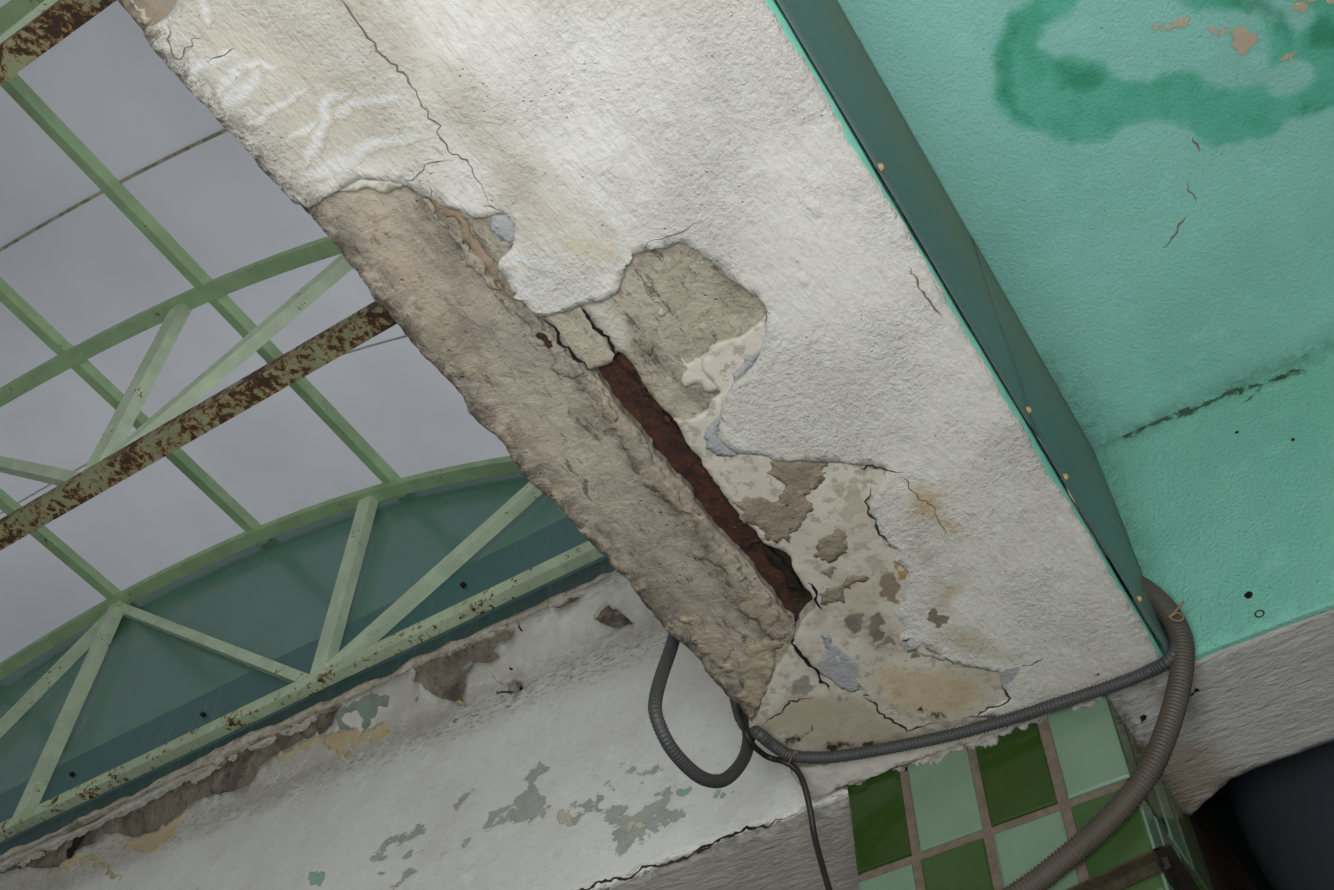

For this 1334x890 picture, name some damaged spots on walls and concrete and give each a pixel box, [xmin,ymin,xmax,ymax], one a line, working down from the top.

flaking render [117,0,176,32]
crack [341,0,498,210]
water stain [984,0,1334,156]
peeling [1208,24,1258,56]
flaking render [302,179,1019,767]
crack [809,583,822,610]
crack [765,636,829,723]
crack [864,697,932,732]
crack [902,638,967,669]
flaking render [0,691,392,881]
peeling [441,761,691,857]
peeling [369,824,426,890]